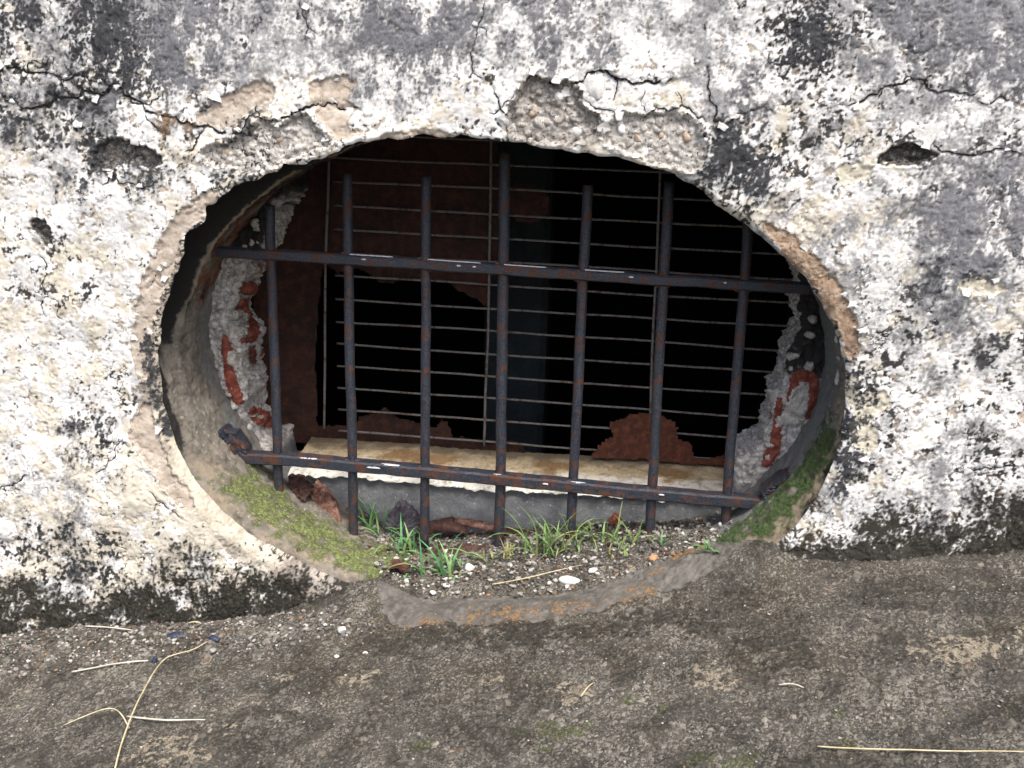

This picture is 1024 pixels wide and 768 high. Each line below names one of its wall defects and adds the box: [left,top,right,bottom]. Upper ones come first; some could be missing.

crack [0,55,359,152]
spalling [179,68,366,179]
spalling [498,73,710,174]
crack [465,2,773,135]
spalling [831,122,943,189]
crack [846,74,1014,110]
crack [933,142,1022,156]
peeling [761,221,868,360]
corrosion [380,450,455,464]
corrosion [658,468,689,483]
leakage [912,476,1024,557]
leakage [0,509,317,634]